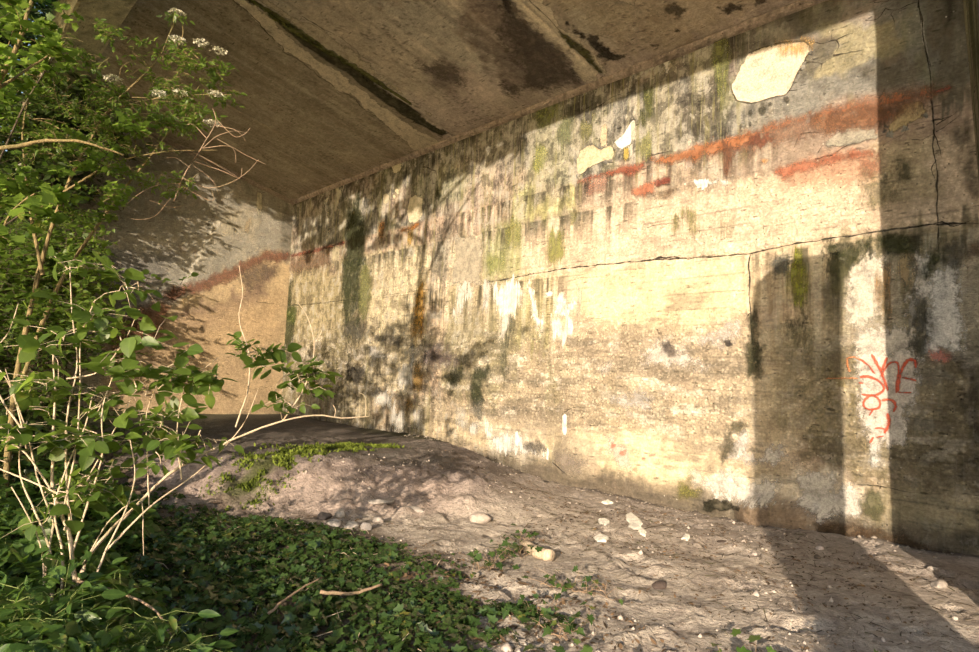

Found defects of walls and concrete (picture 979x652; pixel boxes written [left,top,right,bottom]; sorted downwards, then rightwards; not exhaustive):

peeling [233,0,439,151]
water stain [496,0,580,97]
flaking render [731,40,813,128]
flaking render [574,124,615,178]
corrosion [577,162,644,186]
corrosion [633,177,673,198]
crack [376,0,979,333]
corrosion [655,85,952,175]
corrosion [775,150,879,180]
water stain [453,220,582,347]
water stain [826,231,964,465]
water stain [691,471,778,512]